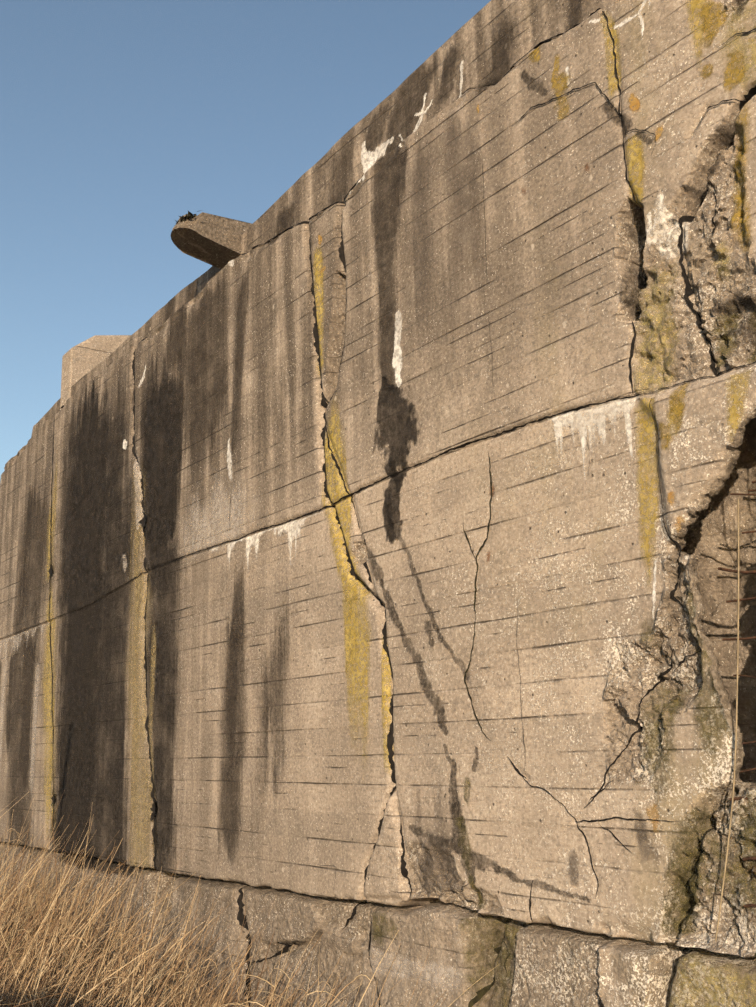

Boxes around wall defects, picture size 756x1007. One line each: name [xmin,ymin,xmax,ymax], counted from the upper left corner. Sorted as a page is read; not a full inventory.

water stain [0,272,248,878]
crack [132,337,184,930]
water stain [211,518,306,563]
water stain [267,207,293,247]
water stain [314,249,323,366]
crack [237,175,412,1007]
water stain [366,546,589,902]
water stain [551,396,639,460]
crack [463,453,752,1007]
spalling [600,549,707,788]
crack [629,321,687,613]
spalling [613,81,756,399]